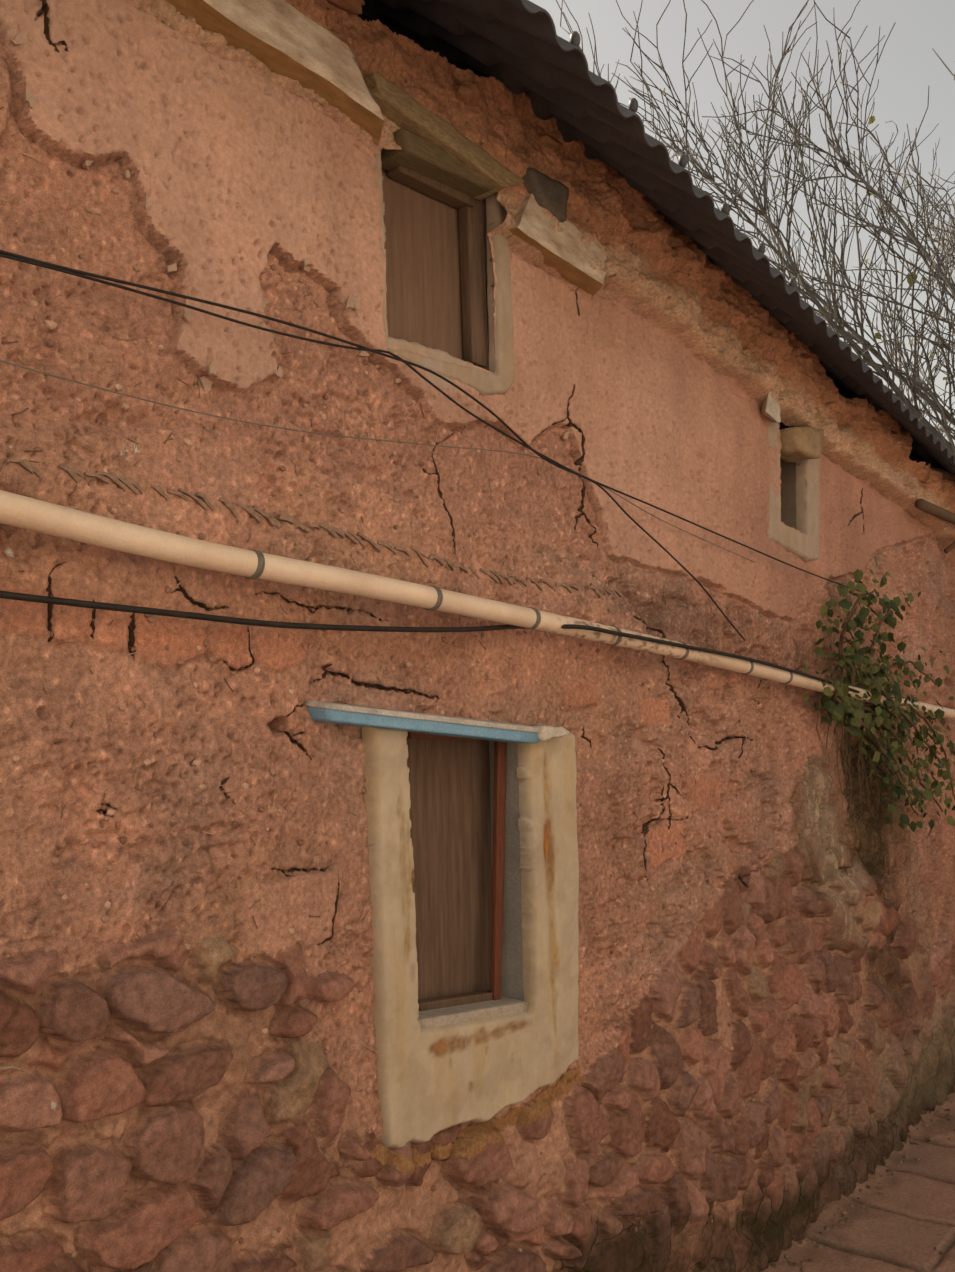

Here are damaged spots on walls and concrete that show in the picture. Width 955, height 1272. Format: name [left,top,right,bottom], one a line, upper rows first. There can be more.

spalling [0,122,619,579]
crack [422,433,456,554]
crack [537,384,598,547]
crack [46,563,64,642]
crack [89,600,97,638]
crack [128,613,136,660]
crack [171,576,255,671]
crack [257,591,388,621]
crack [273,663,440,760]
crack [634,616,757,763]
crack [220,777,235,804]
crack [640,748,688,885]